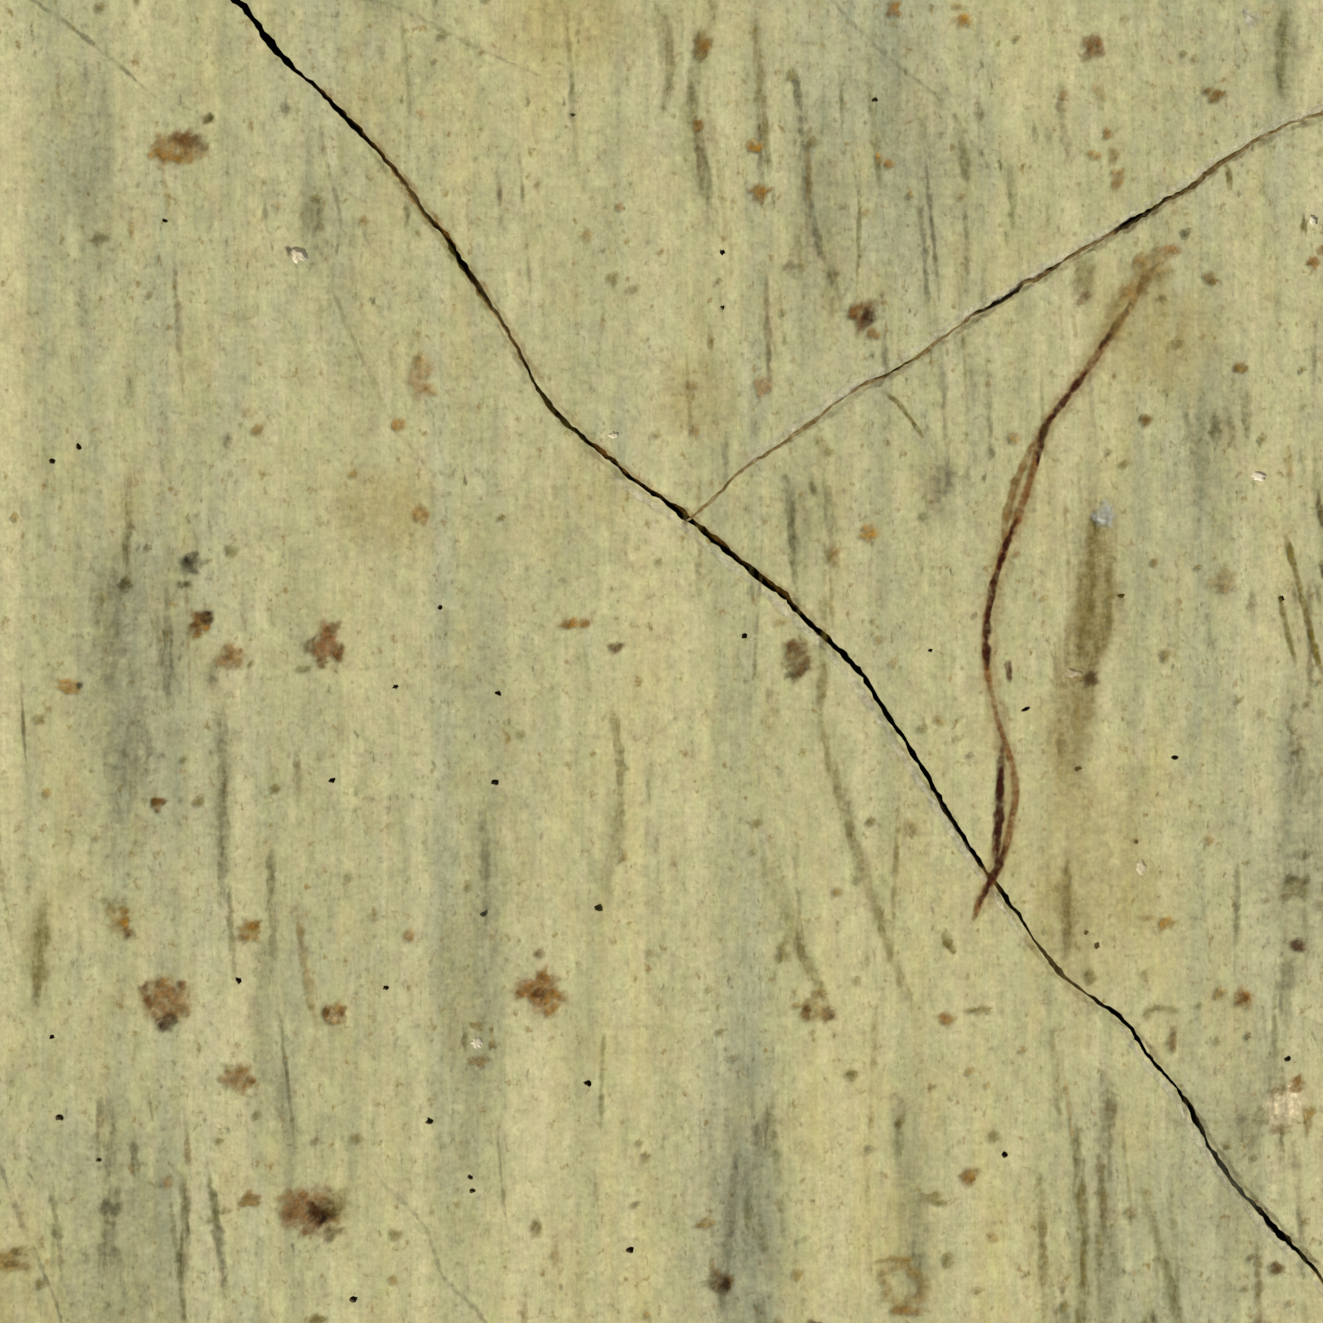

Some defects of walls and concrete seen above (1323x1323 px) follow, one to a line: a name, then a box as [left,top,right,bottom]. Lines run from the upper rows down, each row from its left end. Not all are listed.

corrosion [149,113,214,162]
crack [230,0,1323,885]
corrosion [306,621,344,667]
corrosion [1086,671,1098,684]
corrosion [144,980,186,1030]
corrosion [517,969,563,1014]
crack [974,748,1323,1284]
corrosion [285,1189,343,1241]